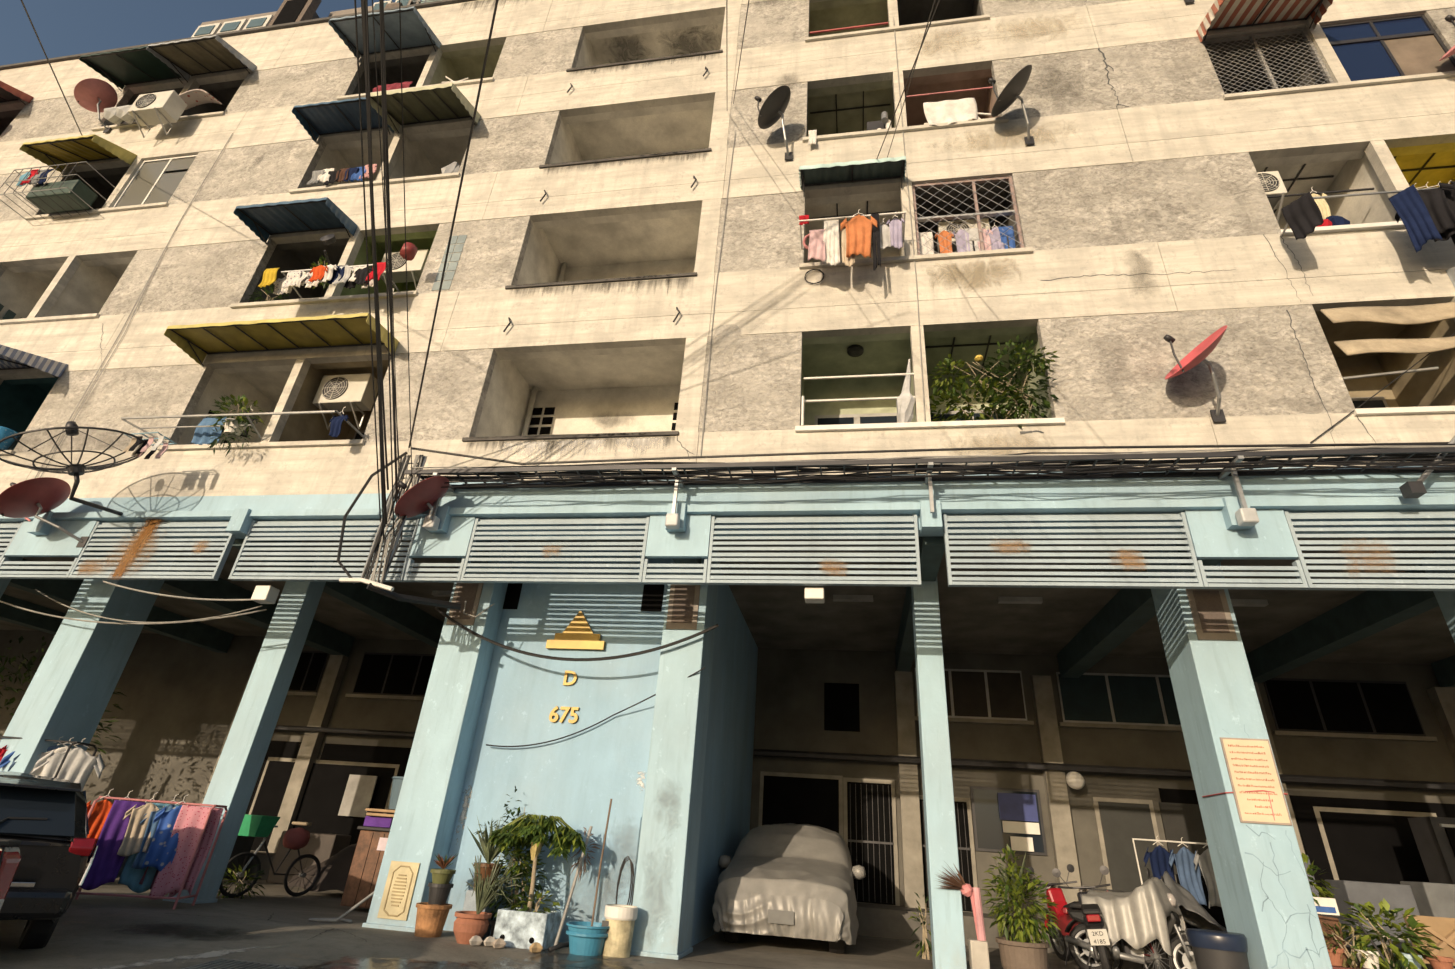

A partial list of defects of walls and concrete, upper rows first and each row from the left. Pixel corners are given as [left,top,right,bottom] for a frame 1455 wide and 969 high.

crack [1098,48,1129,110]
corrosion [112,519,162,578]
crack [1245,825,1323,969]